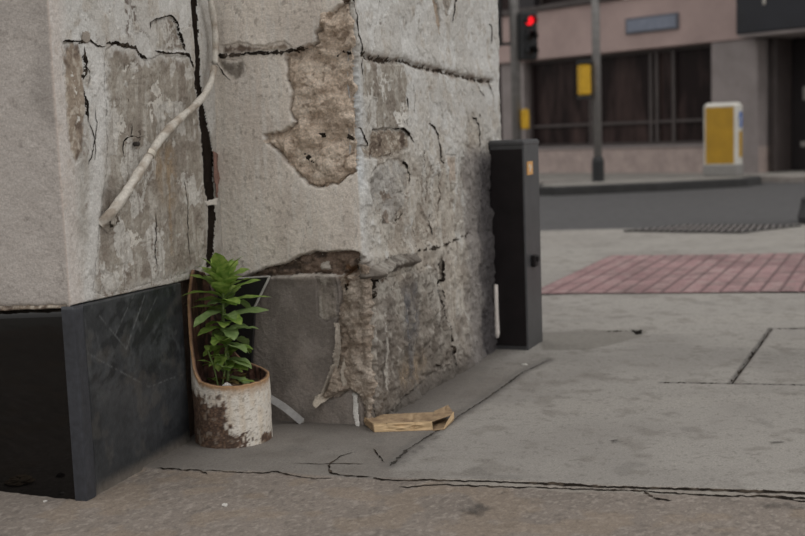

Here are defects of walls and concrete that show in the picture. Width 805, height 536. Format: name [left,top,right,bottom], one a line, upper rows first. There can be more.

crack [63,0,308,267]
spalling [218,0,415,224]
crack [353,0,493,367]
spalling [250,249,453,426]
crack [159,430,805,502]
crack [455,360,548,419]